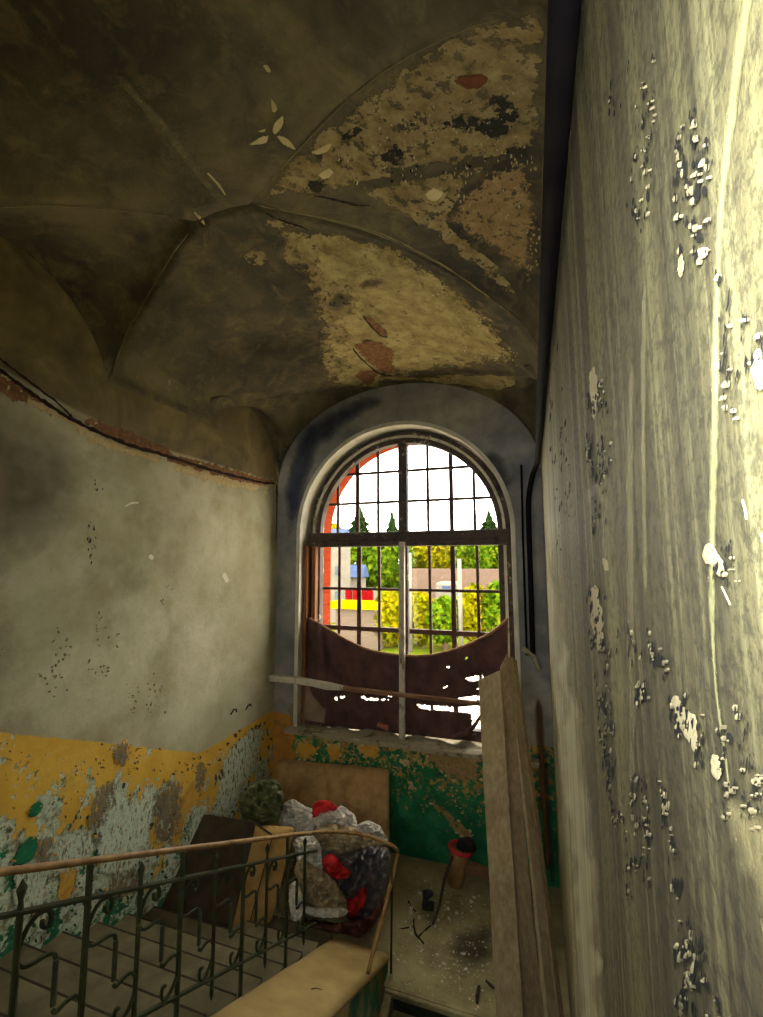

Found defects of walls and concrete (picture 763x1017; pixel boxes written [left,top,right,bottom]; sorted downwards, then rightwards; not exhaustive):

flaking render [250,9,544,391]
leakage [710,0,751,548]
peeling [714,269,763,420]
leakage [627,286,647,796]
peeling [702,539,740,586]
peeling [11,722,272,943]
peeling [295,738,426,789]
leakage [556,633,602,1017]
peeling [586,583,676,900]
peeling [668,692,763,831]
leakage [709,565,730,790]
leakage [729,807,763,879]